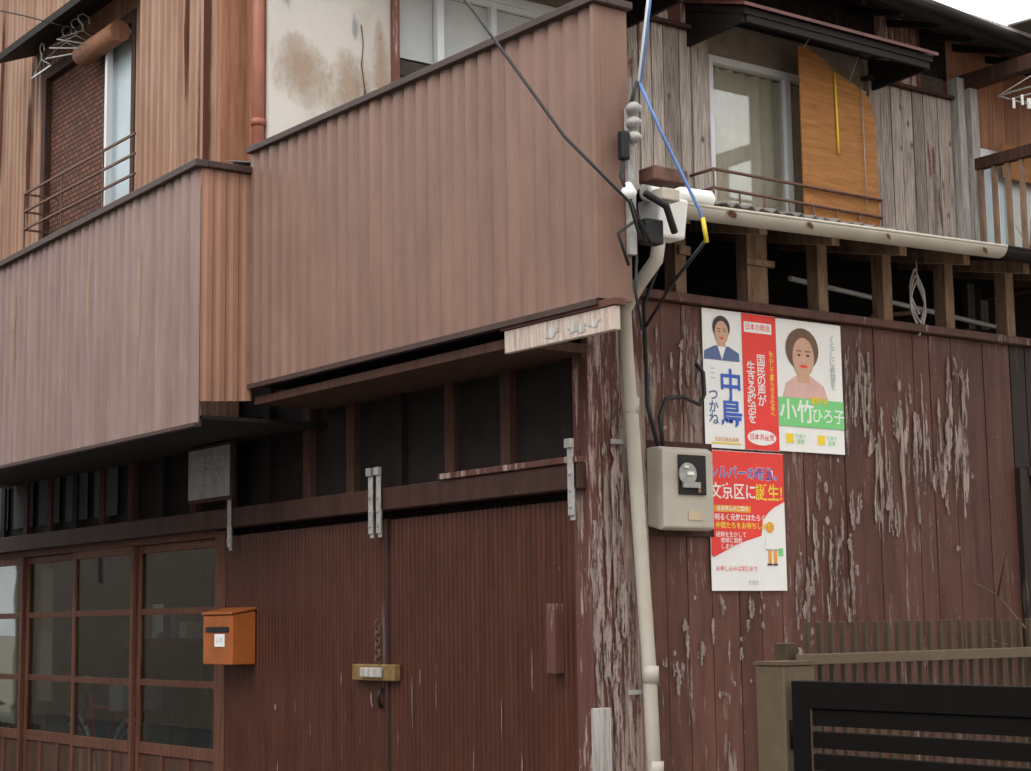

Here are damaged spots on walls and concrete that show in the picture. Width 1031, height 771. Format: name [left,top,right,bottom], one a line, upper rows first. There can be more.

water stain [341,37,386,103]
peeling [647,319,701,403]
peeling [728,339,975,662]
peeling [590,390,647,771]
peeling [658,594,726,698]